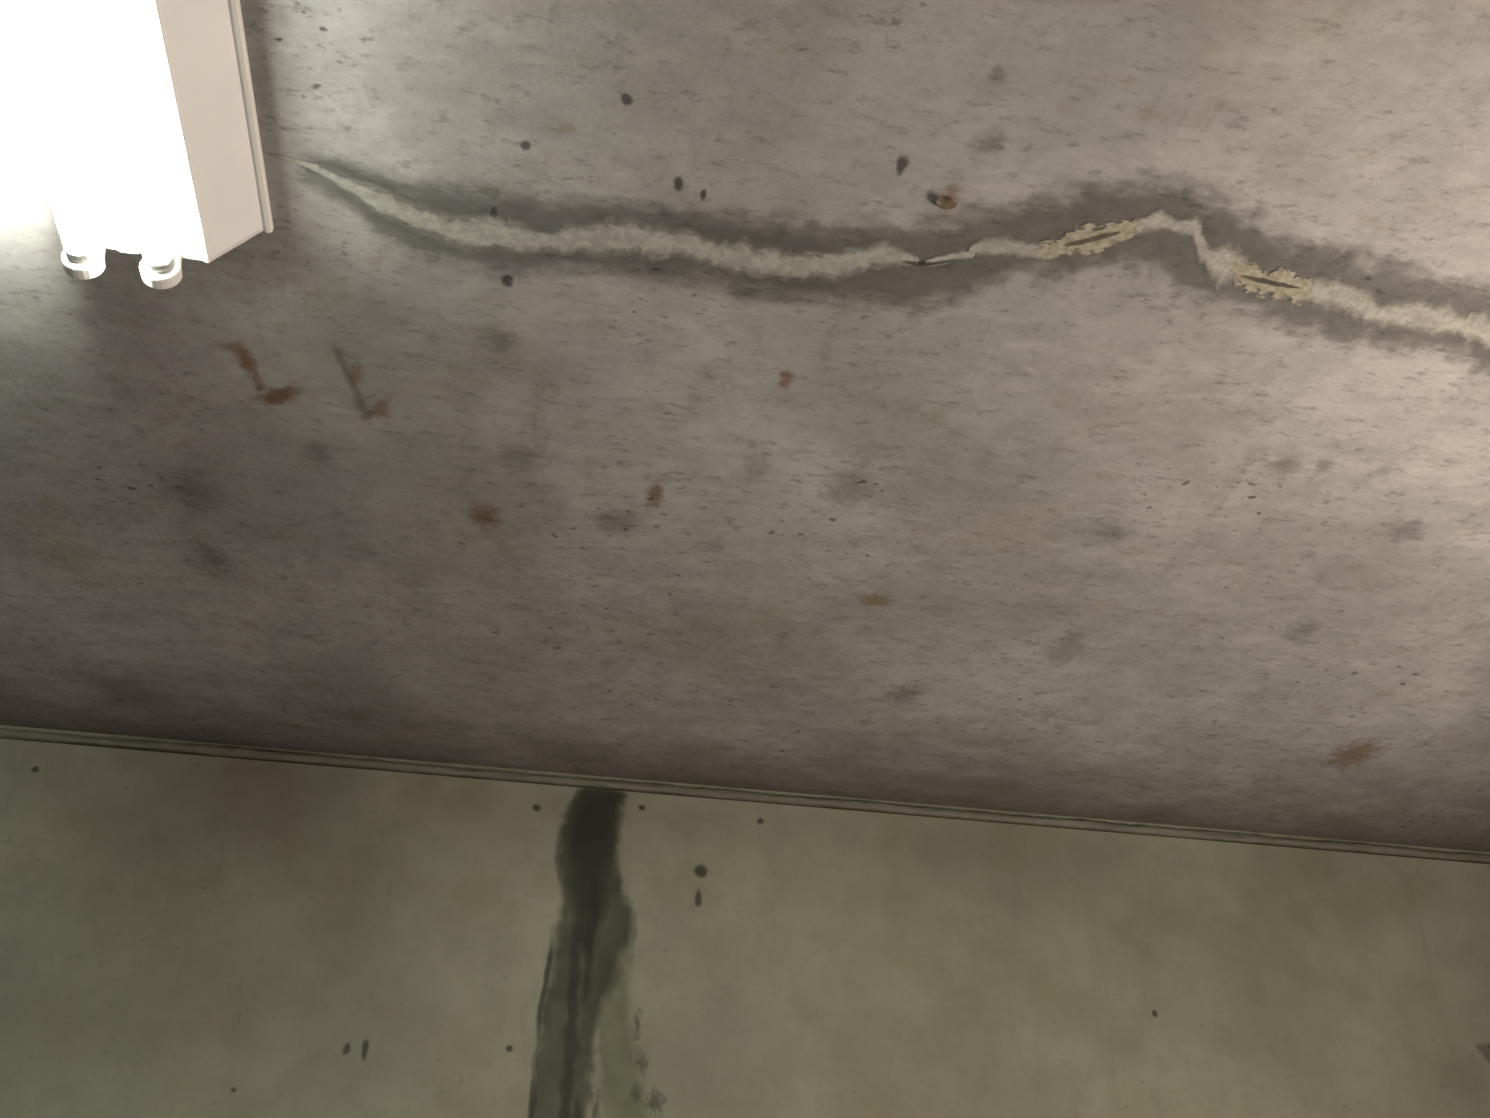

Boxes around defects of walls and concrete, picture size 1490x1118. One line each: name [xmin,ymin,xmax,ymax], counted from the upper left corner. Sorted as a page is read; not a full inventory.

crack [270,154,1490,348]
water stain [529,788,643,1118]